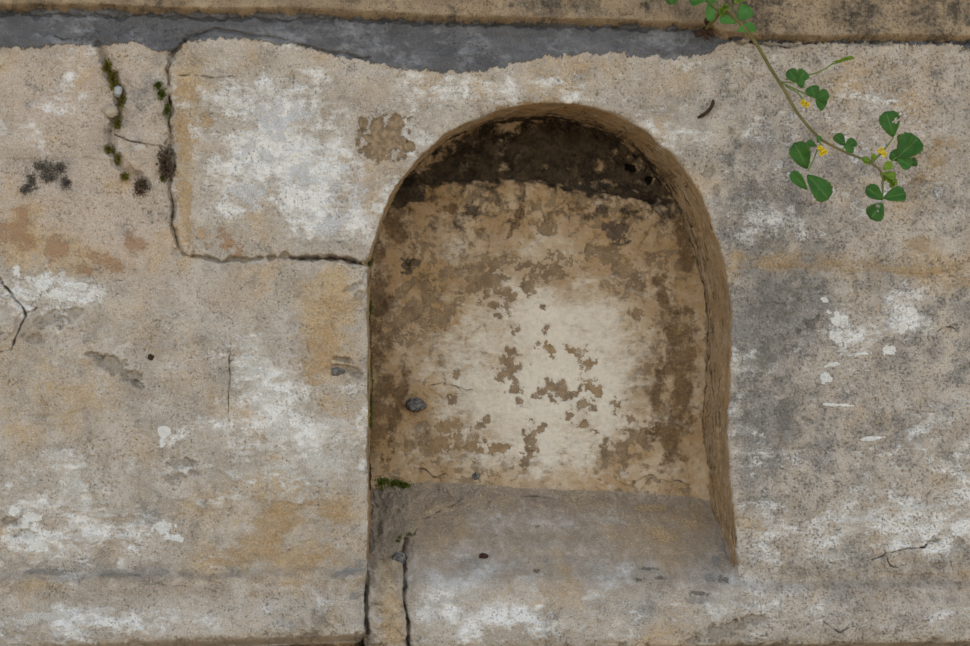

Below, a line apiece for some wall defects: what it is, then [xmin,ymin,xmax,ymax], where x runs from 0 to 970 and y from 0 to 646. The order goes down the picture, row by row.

spalling [356,113,416,165]
leakage [507,200,525,238]
peeling [536,220,557,236]
leakage [604,184,657,203]
peeling [584,221,662,291]
peeling [372,249,652,469]
crack [402,500,464,646]